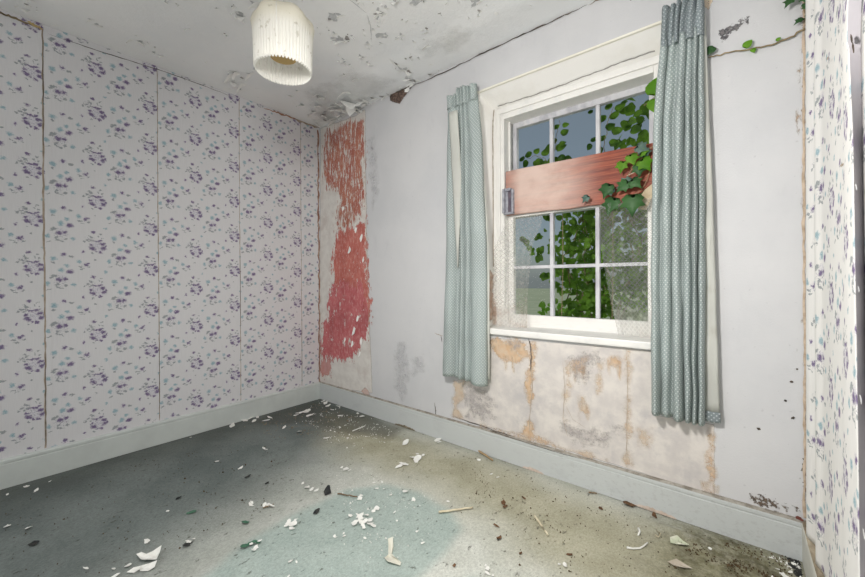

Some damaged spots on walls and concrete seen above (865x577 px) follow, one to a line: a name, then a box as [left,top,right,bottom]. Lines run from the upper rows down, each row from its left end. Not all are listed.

peeling [288,0,458,395]
peeling [453,338,715,494]
water stain [749,493,799,514]